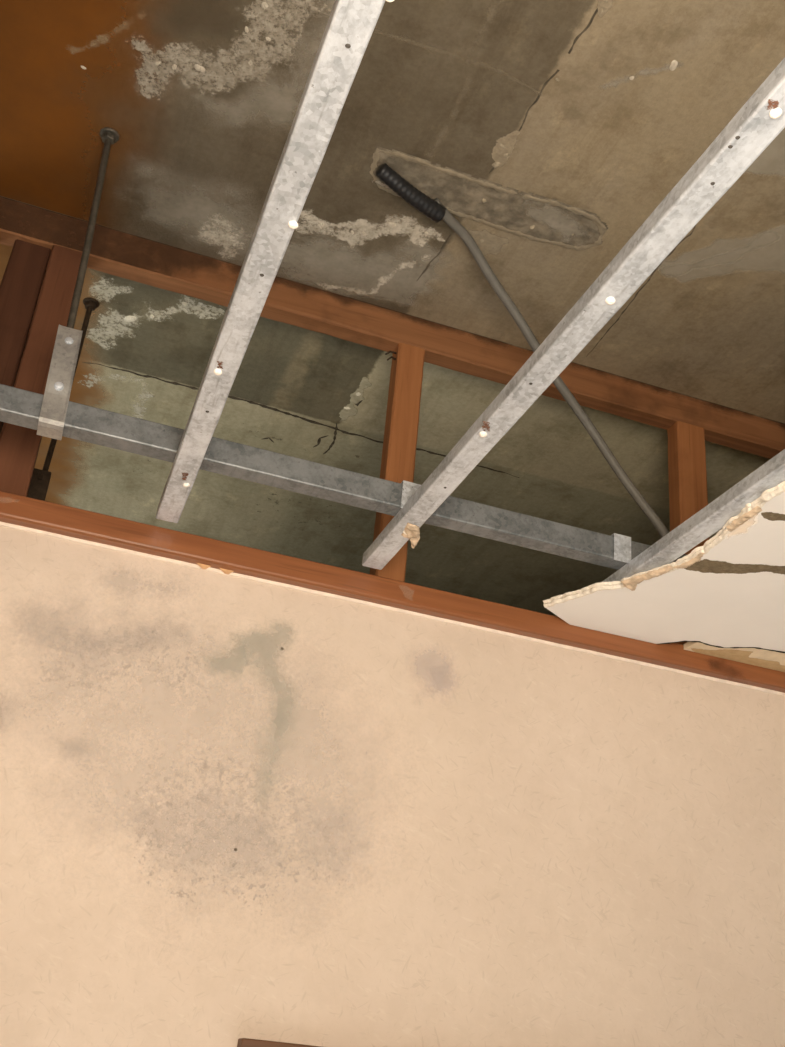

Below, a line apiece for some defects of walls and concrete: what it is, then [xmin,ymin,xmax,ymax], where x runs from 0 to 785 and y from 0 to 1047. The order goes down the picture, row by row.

rust [0,0,163,226]
damp [90,0,335,124]
rust [34,436,81,506]
rust [69,268,105,406]
damp [0,168,252,276]
crack [82,362,199,390]
damp [87,278,224,350]
crack [228,395,383,454]
spalling [339,377,371,420]
damp [273,210,509,345]
crack [586,225,696,357]
spalling [543,481,785,608]